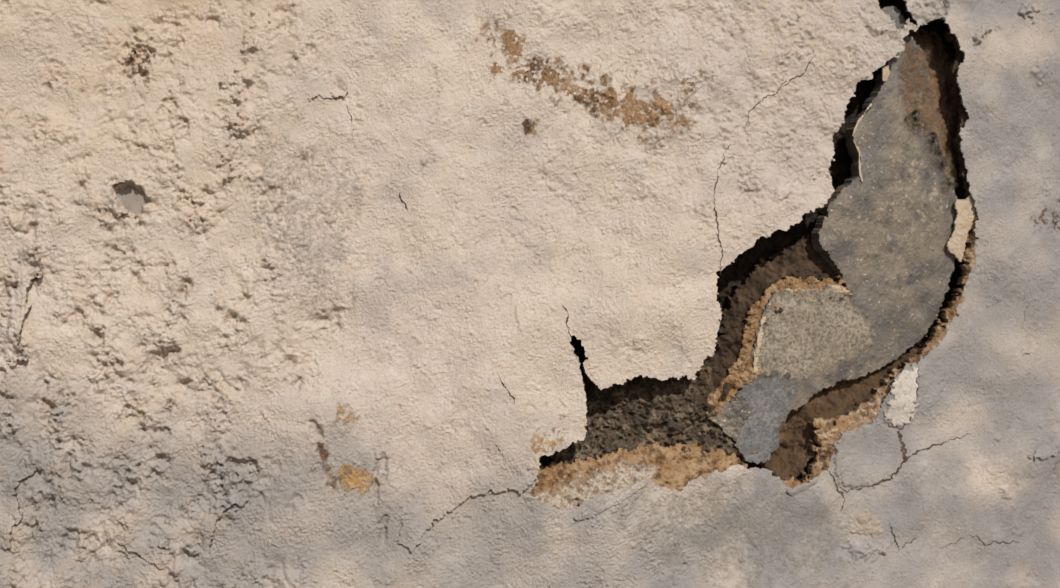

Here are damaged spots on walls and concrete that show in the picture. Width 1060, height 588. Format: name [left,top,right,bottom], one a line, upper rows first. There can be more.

rust [476,23,706,138]
spalling [394,0,979,552]
rust [333,464,372,494]
crack [829,367,969,511]